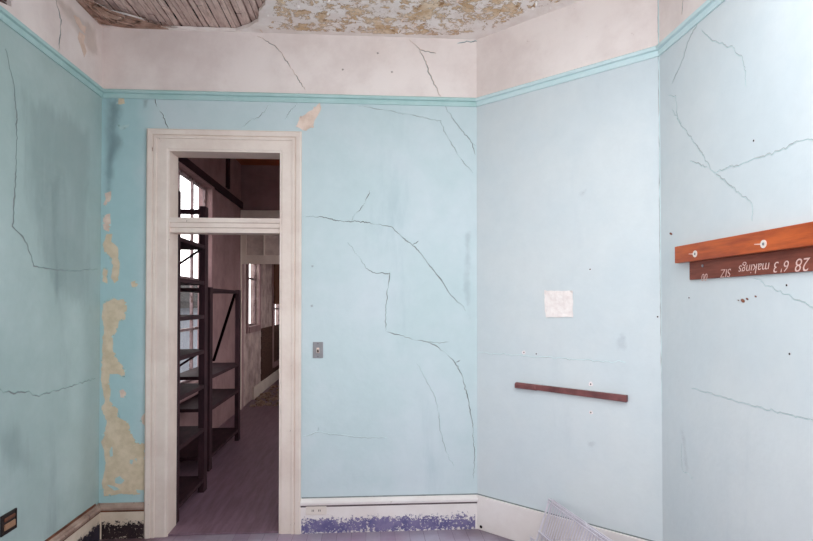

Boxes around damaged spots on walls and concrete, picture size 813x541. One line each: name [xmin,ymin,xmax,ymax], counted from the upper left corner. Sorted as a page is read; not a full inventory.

peeling [260,0,564,35]
crack [5,49,98,272]
peeling [101,191,120,283]
spalling [296,103,321,131]
crack [304,190,466,311]
crack [358,40,476,174]
crack [657,0,813,404]
crack [0,378,96,397]
peeling [101,297,145,497]
crack [348,243,476,479]
peeling [78,520,144,541]
peeling [301,510,475,534]